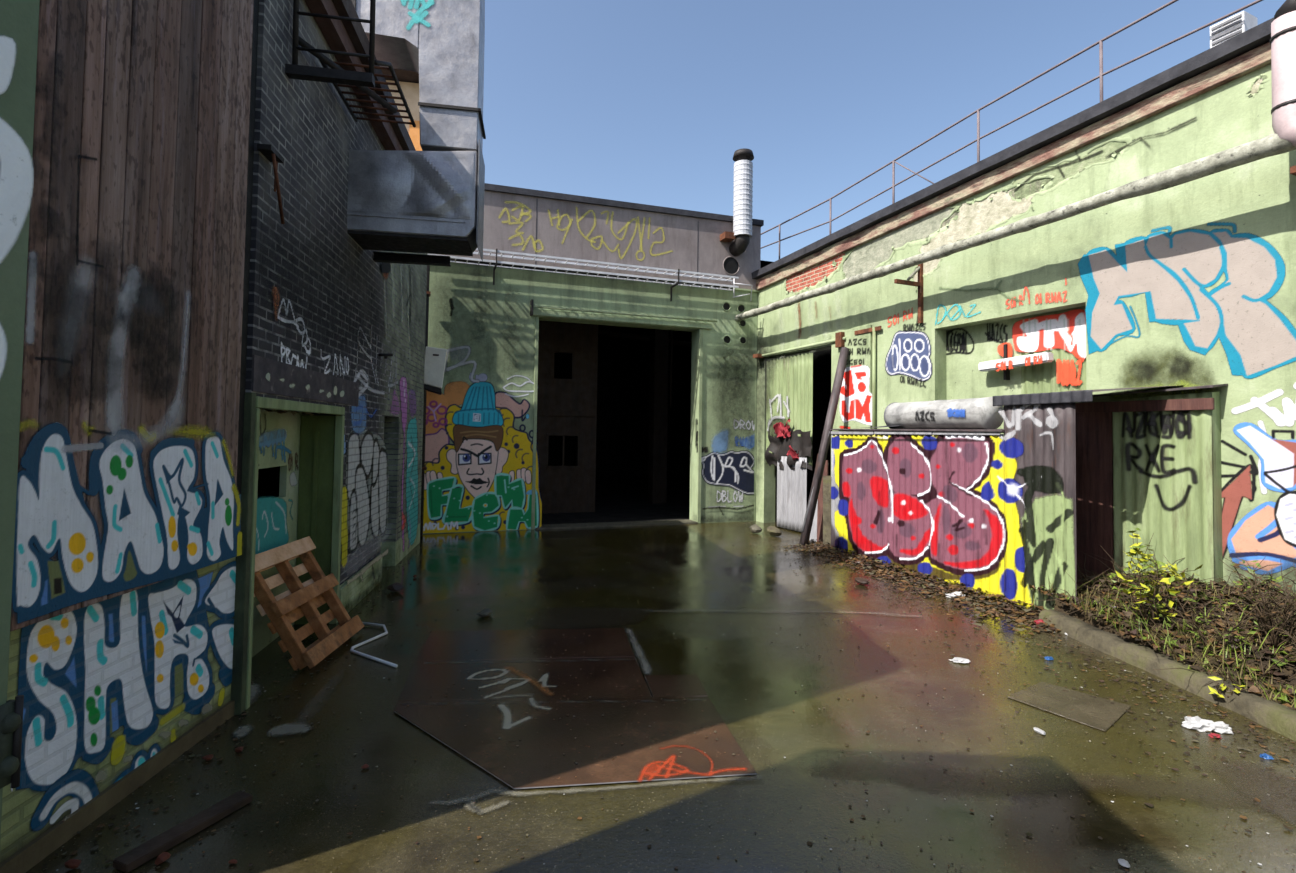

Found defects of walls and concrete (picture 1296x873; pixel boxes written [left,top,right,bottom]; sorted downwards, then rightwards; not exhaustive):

peeling [783,136,1135,295]